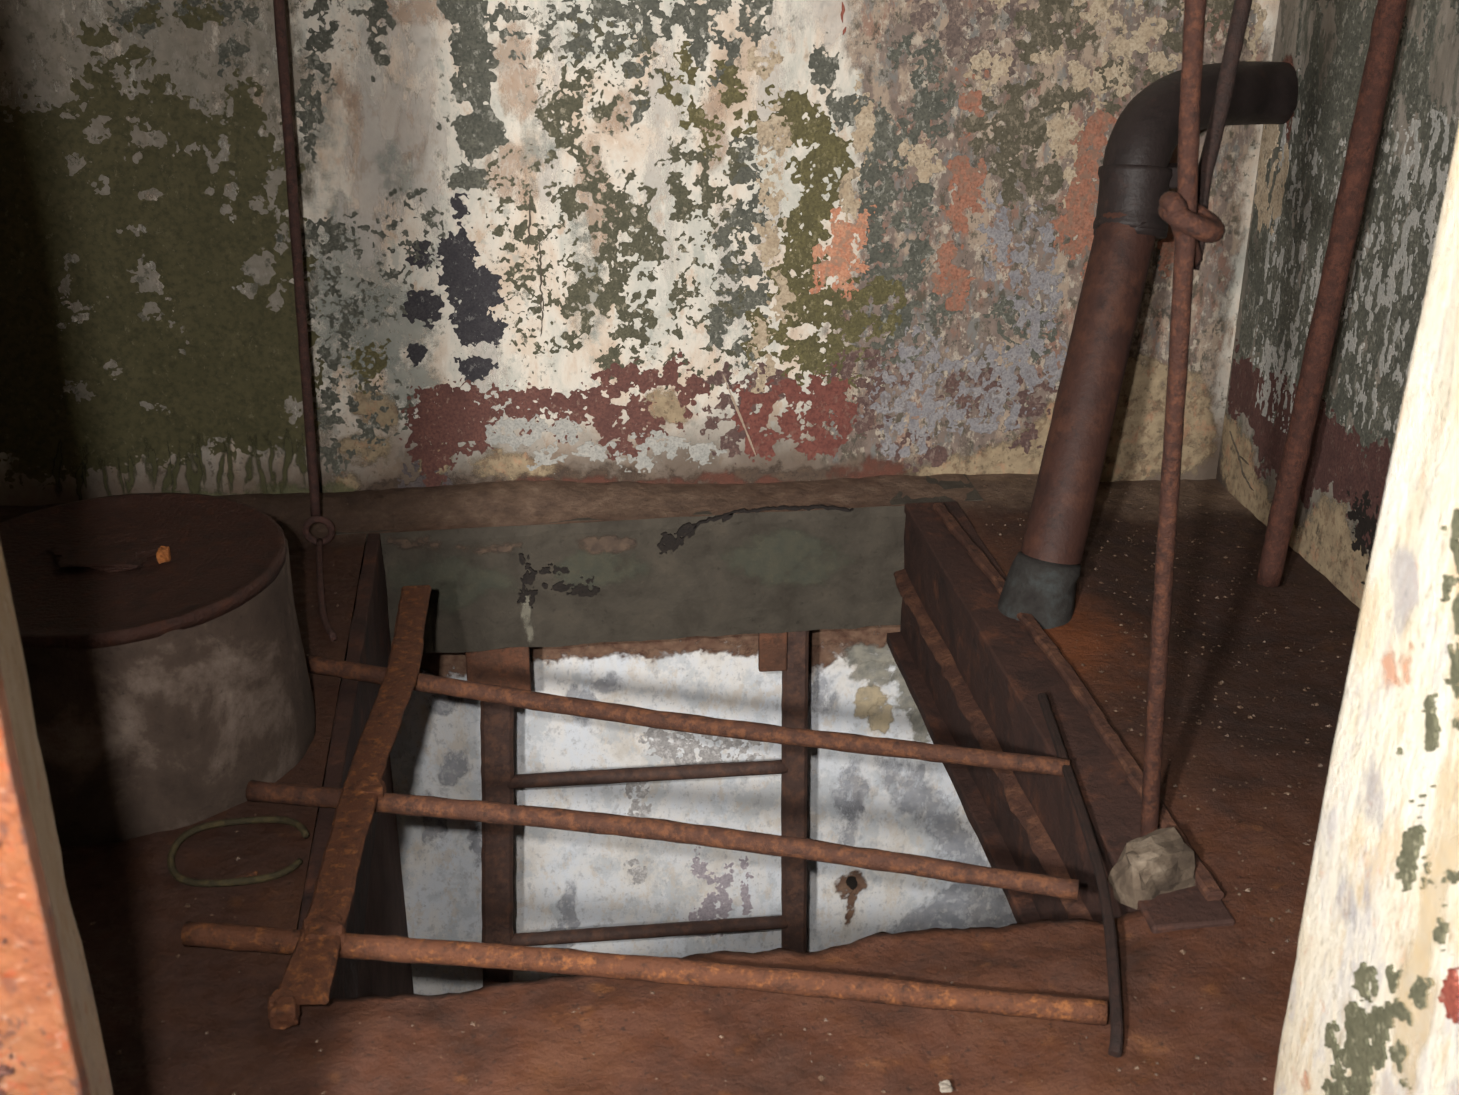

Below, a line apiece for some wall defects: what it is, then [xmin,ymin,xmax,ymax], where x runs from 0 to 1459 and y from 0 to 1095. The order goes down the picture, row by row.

damp [0,0,471,500]
damp [474,341,504,410]
peeling [0,0,1184,490]
damp [644,47,678,268]
damp [493,462,850,484]
crack [672,504,853,549]
damp [757,12,784,140]
peeling [1181,0,1378,526]
peeling [1289,0,1459,609]
peeling [1422,509,1459,752]
peeling [1321,785,1459,1095]
corrosion [0,1052,15,1095]